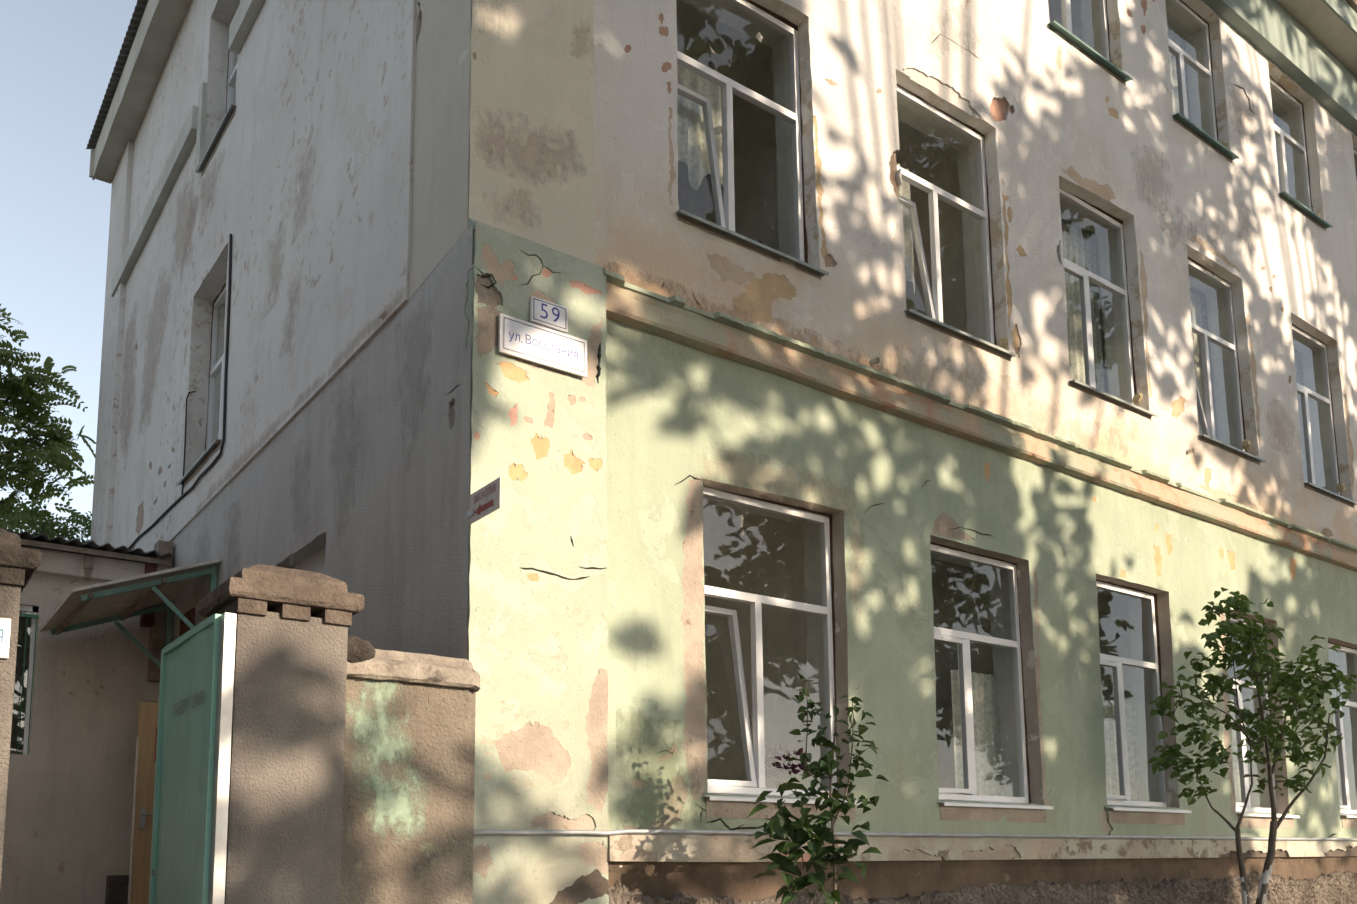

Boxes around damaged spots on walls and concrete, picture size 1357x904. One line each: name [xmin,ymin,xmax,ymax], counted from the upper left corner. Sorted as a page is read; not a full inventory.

flaking render [903,69,1015,121]
peeling [1061,166,1115,202]
peeling [706,253,797,323]
peeling [472,242,603,482]
crack [521,537,606,580]
peeling [931,512,974,541]
peeling [622,477,708,829]
peeling [491,721,571,785]
peeling [531,668,658,904]